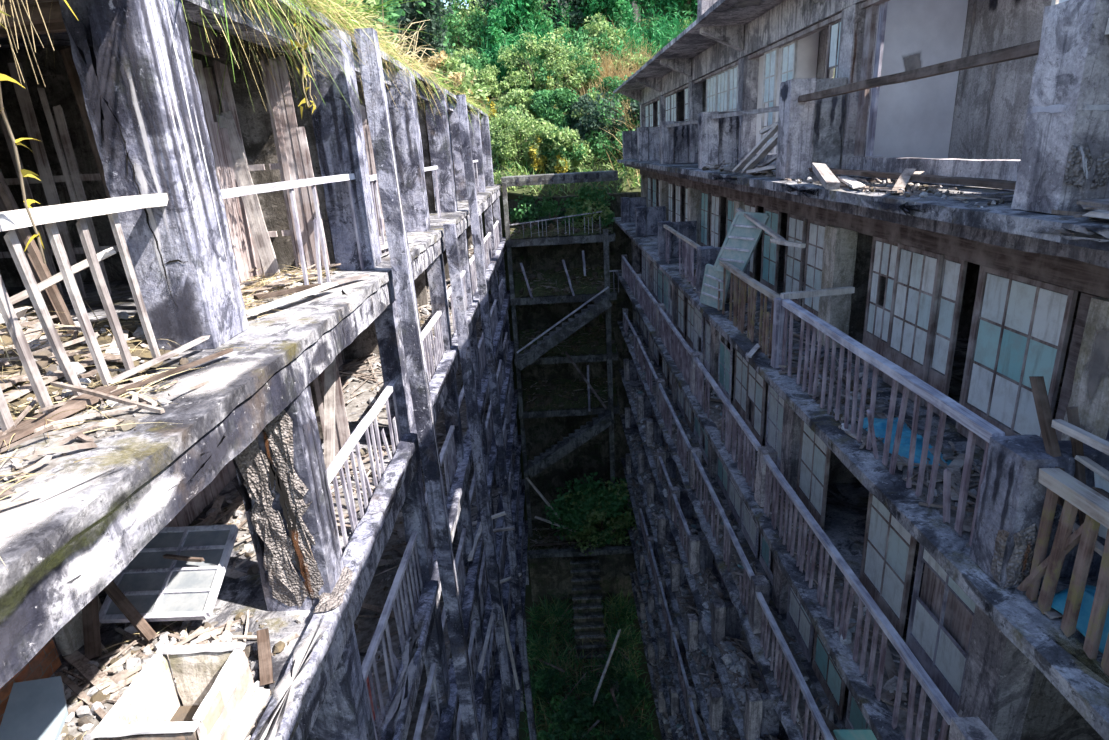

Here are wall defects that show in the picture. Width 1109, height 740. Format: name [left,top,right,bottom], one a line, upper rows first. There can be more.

crack [110,102,188,309]
spalling [1065,143,1109,190]
water stain [0,469,116,547]
spalling [234,410,353,613]
water stain [63,543,117,593]
spalling [990,523,1038,589]